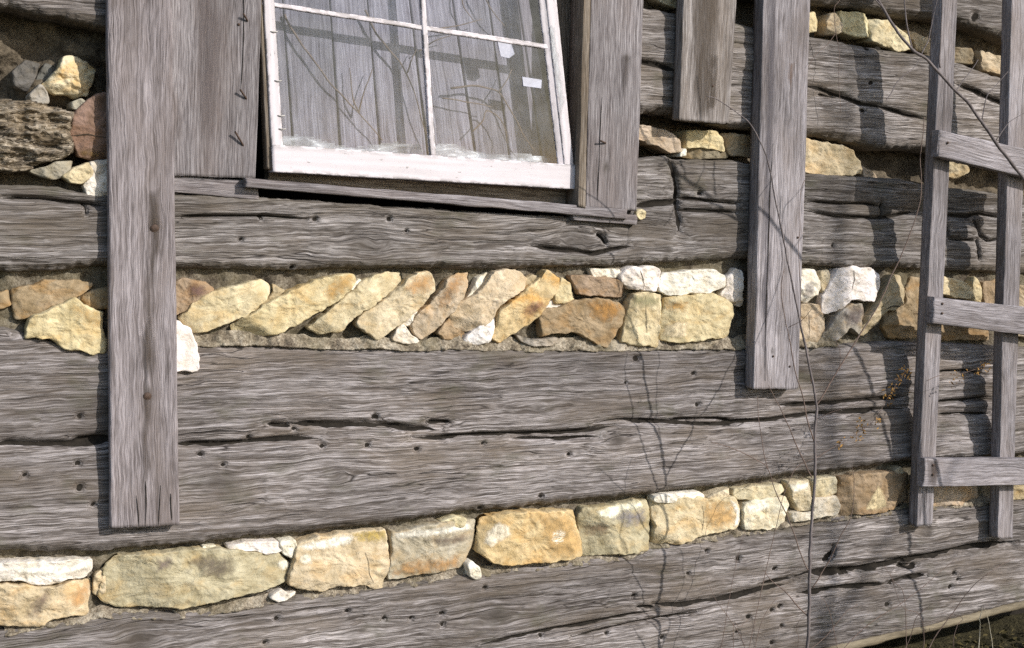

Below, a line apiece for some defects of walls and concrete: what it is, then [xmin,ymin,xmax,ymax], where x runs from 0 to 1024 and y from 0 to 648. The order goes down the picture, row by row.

crack [136,481,172,525]